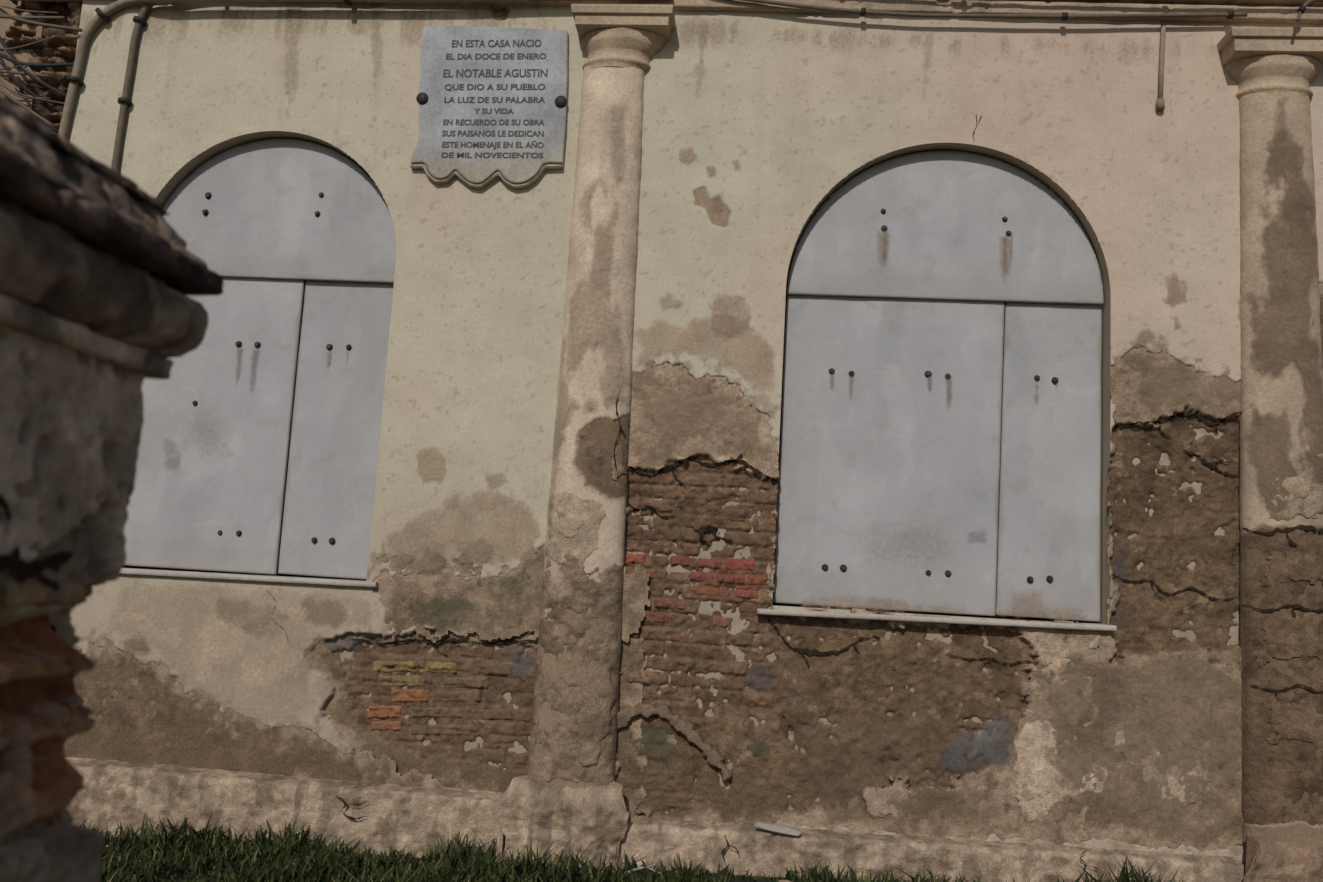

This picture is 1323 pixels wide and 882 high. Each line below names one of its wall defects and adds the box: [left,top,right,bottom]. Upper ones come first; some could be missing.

flaking render [680,148,731,227]
leakage [555,185,623,455]
peeling [1168,277,1185,305]
leakage [1249,100,1323,512]
flaking render [0,296,1323,852]
crack [614,391,776,547]
crack [1242,524,1323,547]
crack [1251,684,1323,701]